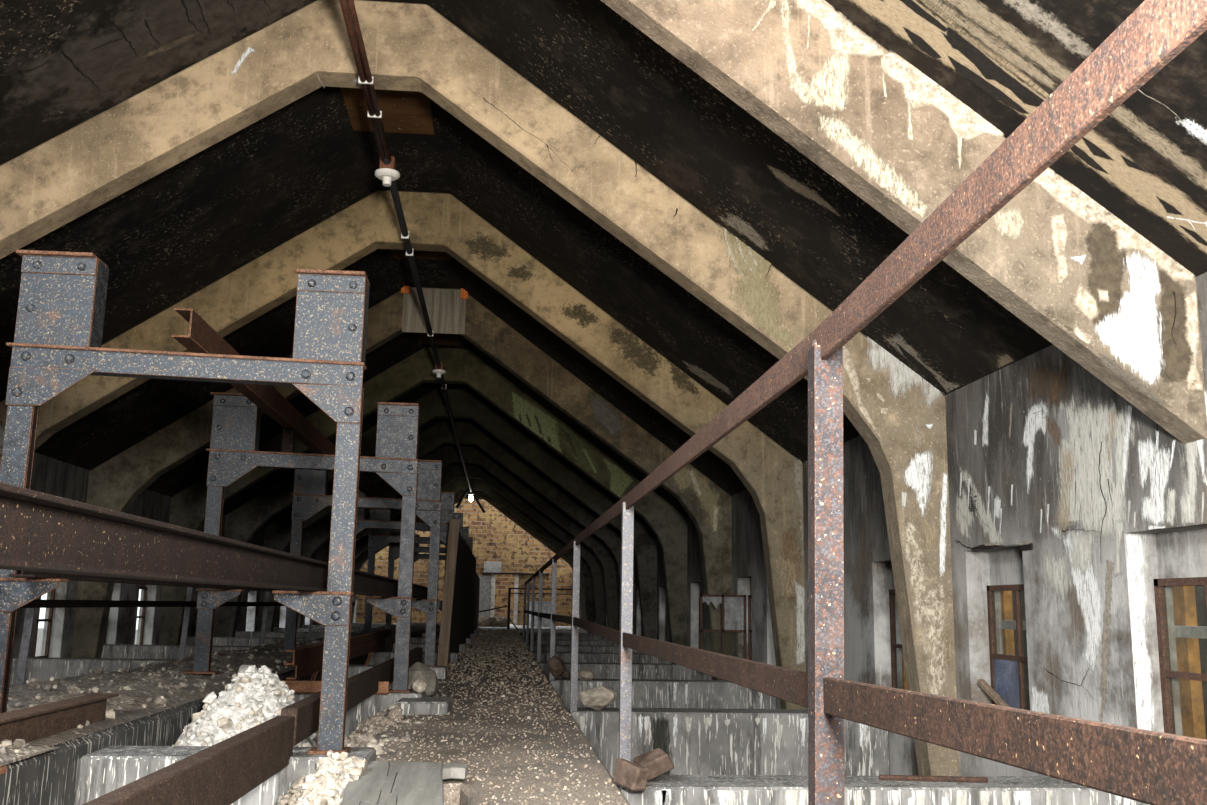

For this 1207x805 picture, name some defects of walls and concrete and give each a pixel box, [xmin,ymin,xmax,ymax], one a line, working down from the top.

water stain [852,0,1091,117]
water stain [820,116,927,218]
water stain [1069,106,1207,253]
water stain [463,232,535,281]
crack [1167,216,1207,231]
water stain [560,304,598,328]
water stain [610,328,734,397]
peeling [865,337,941,414]
rust [1027,355,1071,408]
crack [1062,441,1113,559]
peeling [901,424,948,696]